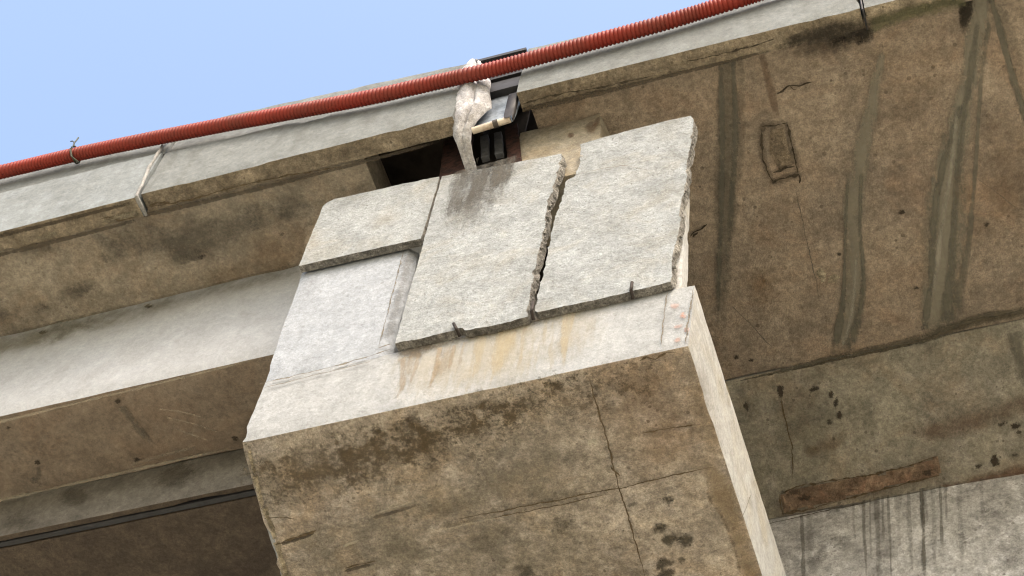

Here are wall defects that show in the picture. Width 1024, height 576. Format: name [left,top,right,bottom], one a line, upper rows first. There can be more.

water stain [448,157,514,209]
water stain [716,60,738,299]
crack [777,82,811,94]
water stain [781,21,873,47]
water stain [833,54,884,350]
water stain [922,0,1024,329]
crack [455,379,716,576]
water stain [654,524,692,576]